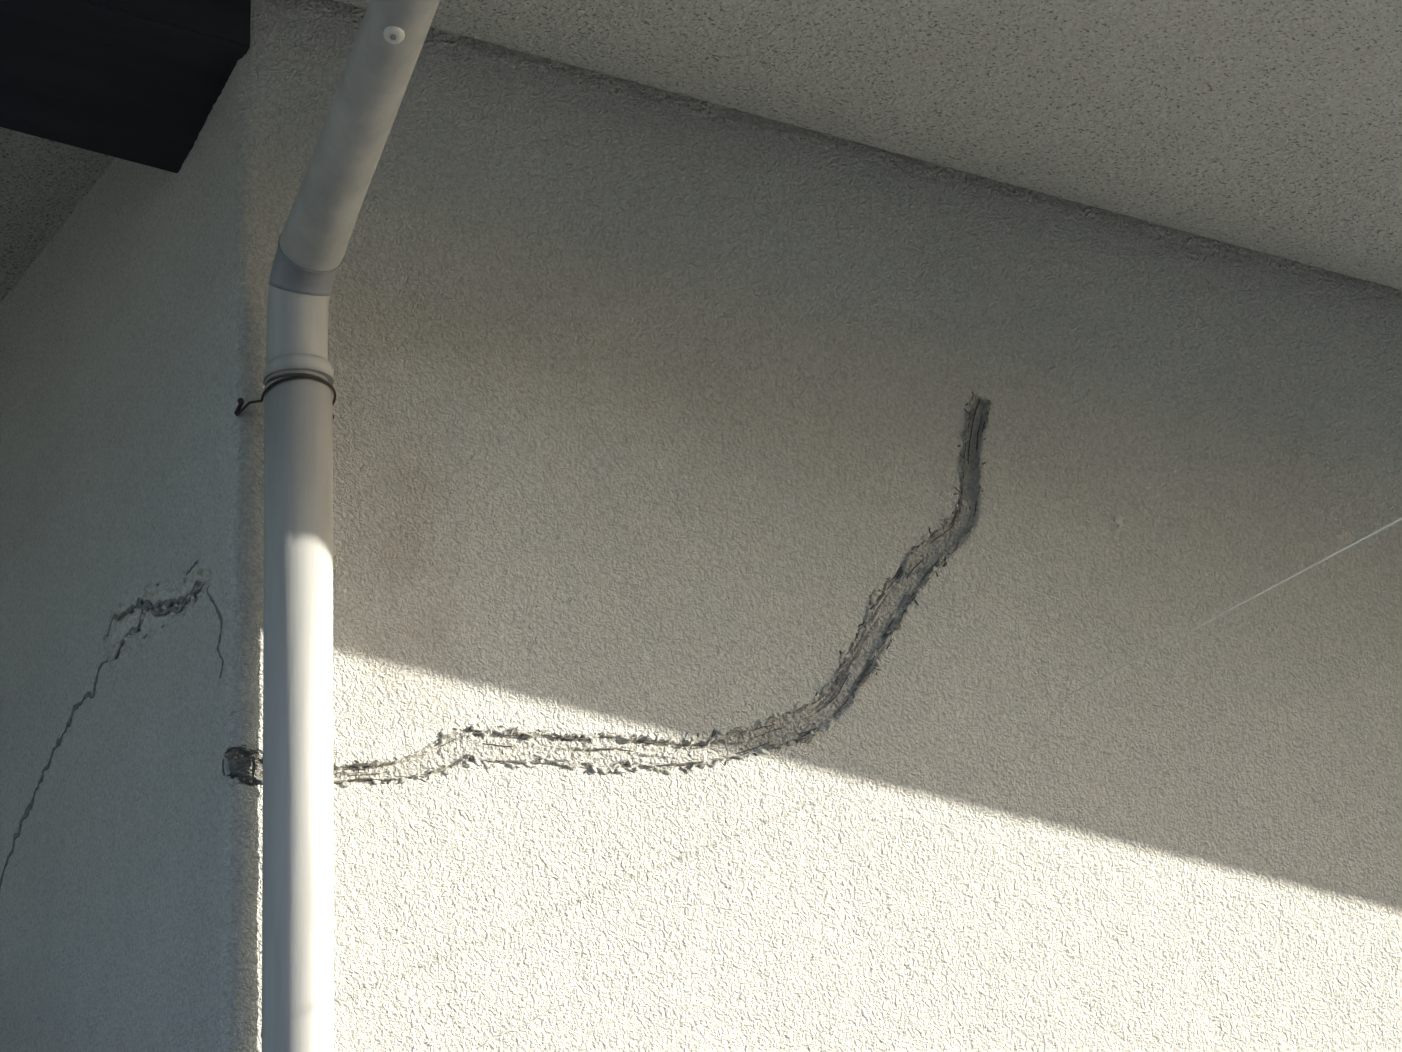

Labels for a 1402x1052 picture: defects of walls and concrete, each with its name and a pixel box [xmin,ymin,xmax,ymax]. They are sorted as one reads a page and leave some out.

crack [0,560,224,888]
crack [333,391,992,788]